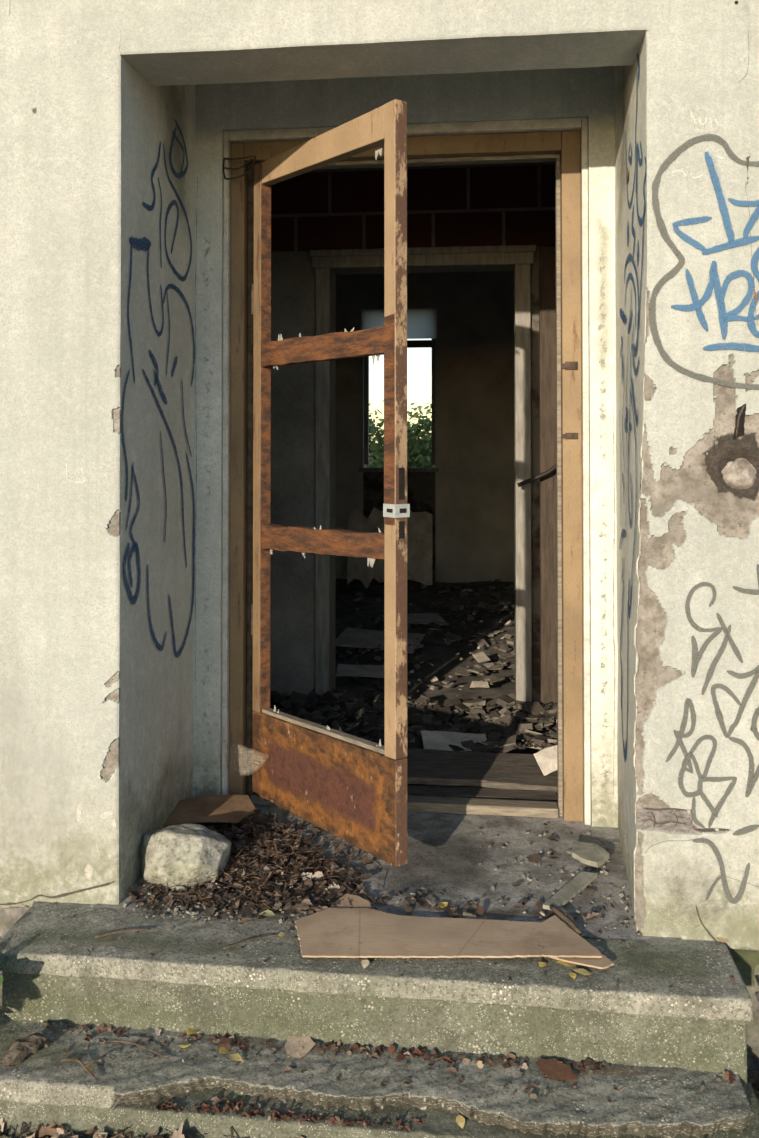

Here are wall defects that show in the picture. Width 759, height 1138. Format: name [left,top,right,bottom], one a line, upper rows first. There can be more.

peeling [104,511,119,536]
flaking render [635,354,759,932]
peeling [103,672,119,703]
peeling [99,738,119,782]